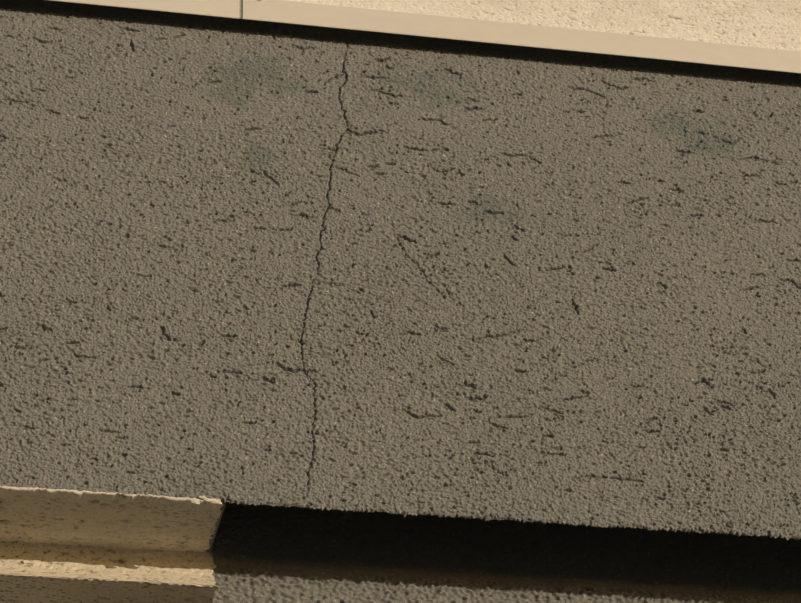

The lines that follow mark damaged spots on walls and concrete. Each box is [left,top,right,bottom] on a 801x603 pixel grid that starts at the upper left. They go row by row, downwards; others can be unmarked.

crack [278,44,353,491]